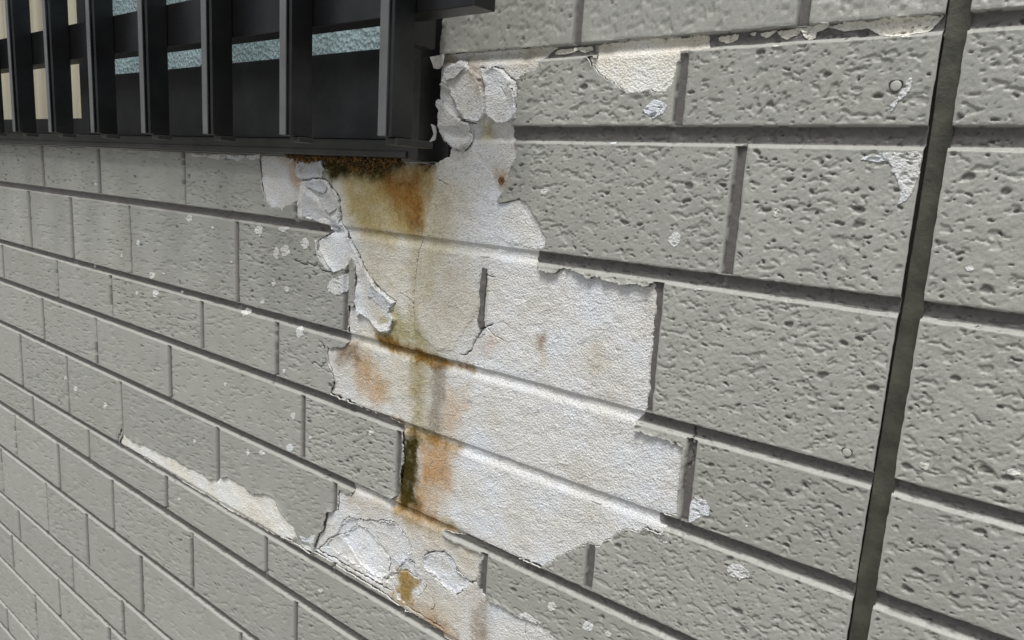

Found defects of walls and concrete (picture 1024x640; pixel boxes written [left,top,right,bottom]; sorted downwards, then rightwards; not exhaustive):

leakage [322,160,404,178]
crack [462,324,502,355]
peeling [120,15,944,640]
corrosion [415,349,448,366]